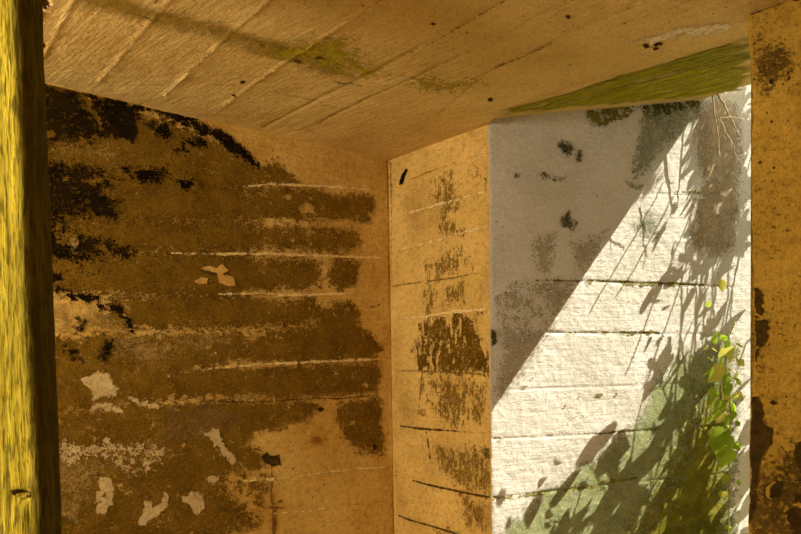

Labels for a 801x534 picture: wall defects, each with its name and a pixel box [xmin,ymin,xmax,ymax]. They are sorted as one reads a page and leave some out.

damp [86,0,352,79]
damp [45,84,260,414]
peeling [45,85,387,534]
spalling [754,288,769,372]
damp [59,396,243,532]
spalling [749,397,783,522]
spalling [786,492,801,534]
spalling [792,441,801,481]